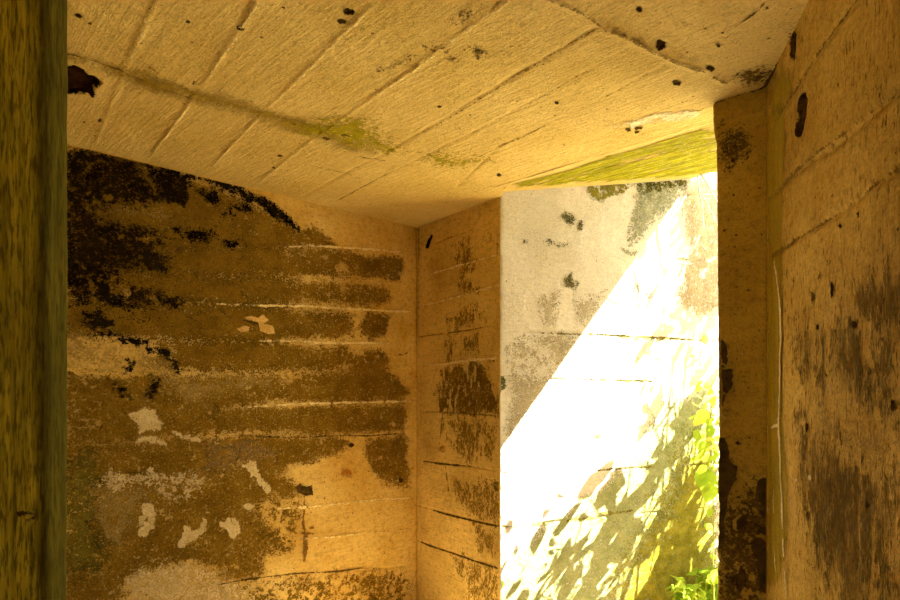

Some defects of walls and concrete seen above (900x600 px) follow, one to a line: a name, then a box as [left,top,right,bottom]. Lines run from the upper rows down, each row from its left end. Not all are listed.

spalling [68,65,100,98]
damp [105,66,367,151]
damp [67,147,301,446]
peeling [66,146,415,600]
spalling [721,340,733,414]
damp [80,430,278,553]
damp [125,518,255,600]
spalling [718,437,747,552]
spalling [750,478,766,595]